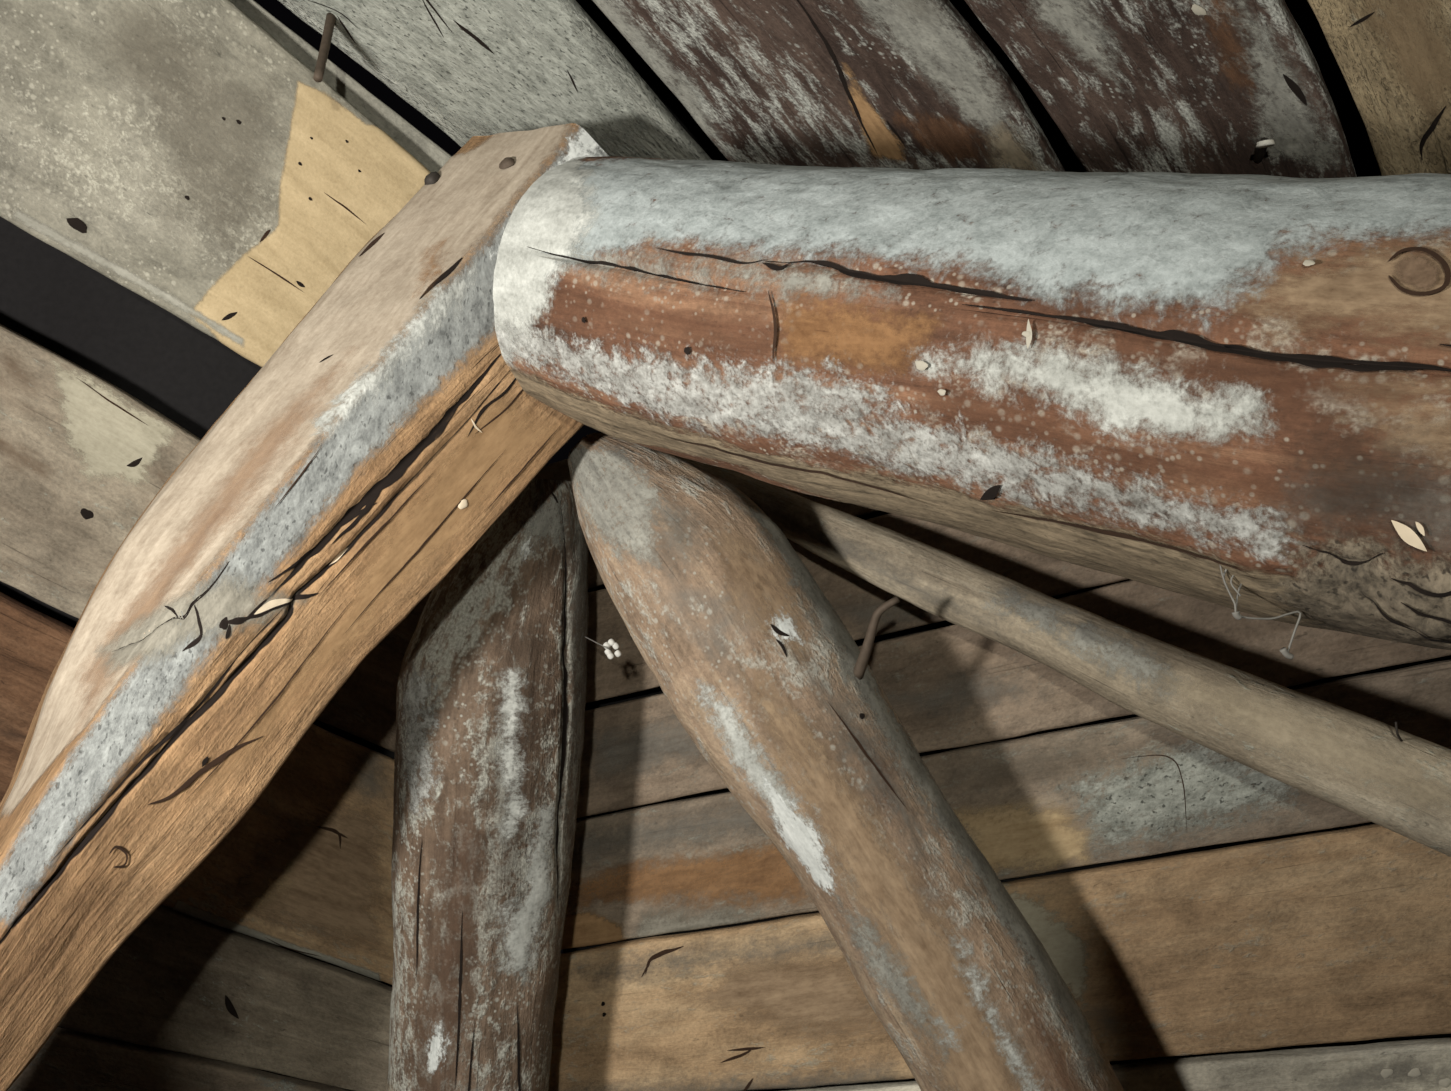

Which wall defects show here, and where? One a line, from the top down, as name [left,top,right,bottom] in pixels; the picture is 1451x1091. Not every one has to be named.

mould [299,0,647,175]
mould [593,0,728,156]
damp [858,0,1020,161]
mould [1036,0,1115,79]
damp [1191,0,1340,168]
damp [192,200,520,597]
crack [0,354,561,943]
mould [0,611,236,922]
crack [225,995,239,1019]